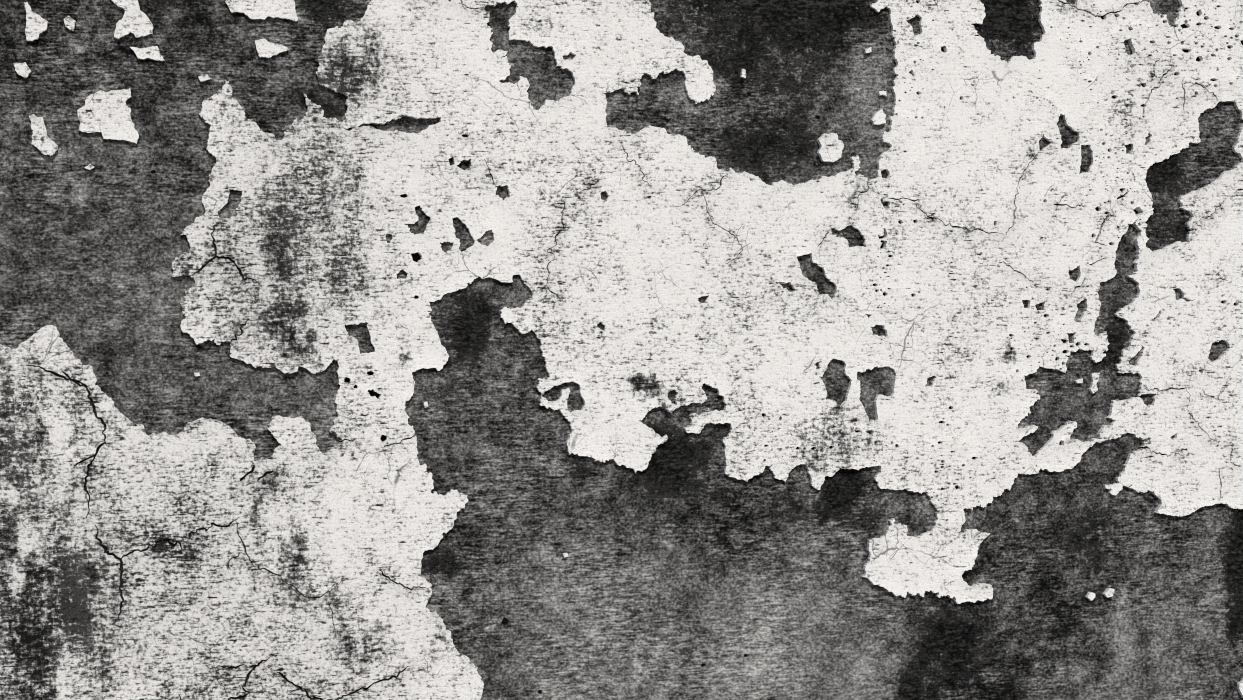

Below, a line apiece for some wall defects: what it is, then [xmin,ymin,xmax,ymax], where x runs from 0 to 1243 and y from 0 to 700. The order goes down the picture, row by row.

peeling [605,0,920,185]
peeling [979,0,1043,62]
peeling [0,0,440,461]
crack [194,225,257,282]
crack [230,319,248,342]
leakage [2,371,55,488]
leakage [59,371,97,502]
crack [26,365,334,626]
peeling [405,101,1243,700]
leakage [55,517,147,698]
crack [380,570,426,590]
crack [216,656,406,700]